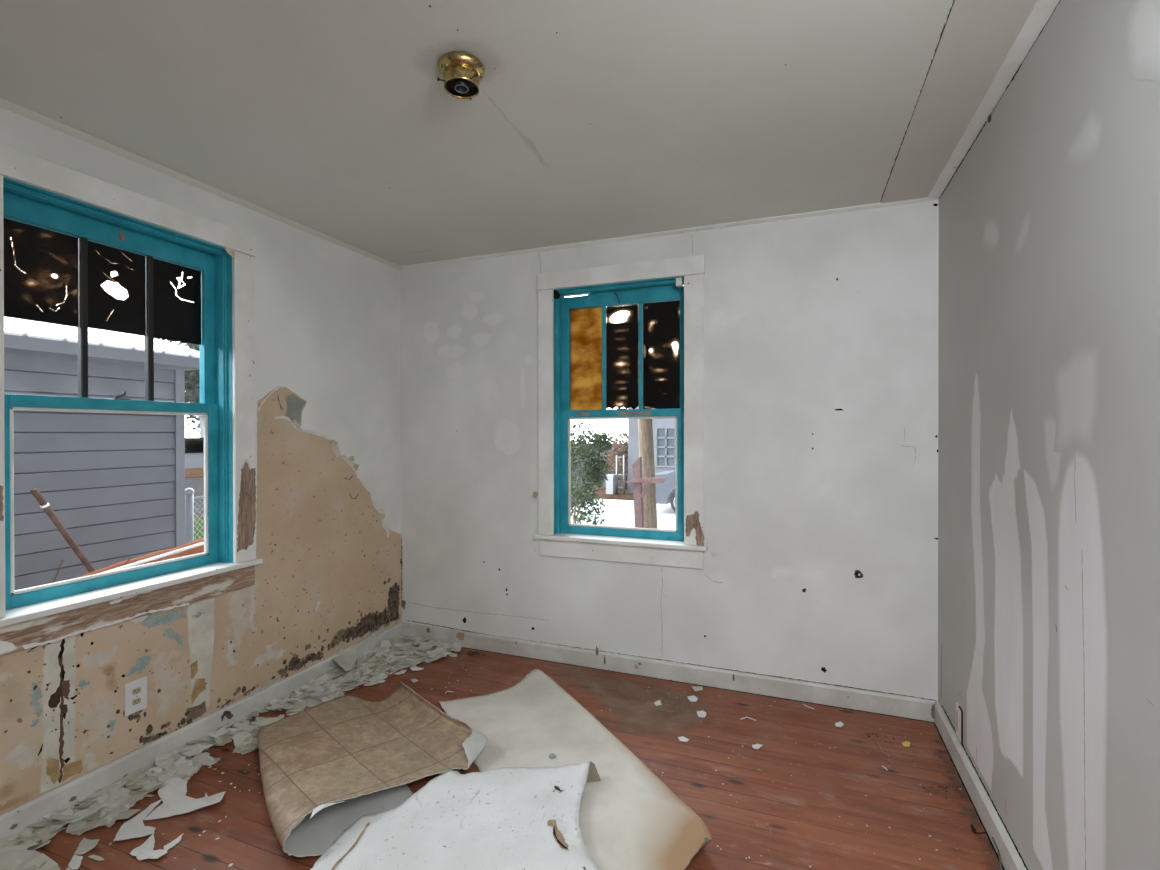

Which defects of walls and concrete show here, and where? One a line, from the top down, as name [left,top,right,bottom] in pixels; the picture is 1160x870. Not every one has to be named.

crack [28,638,66,783]
peeling [0,386,406,795]
water stain [216,578,400,709]
peeling [686,510,704,546]